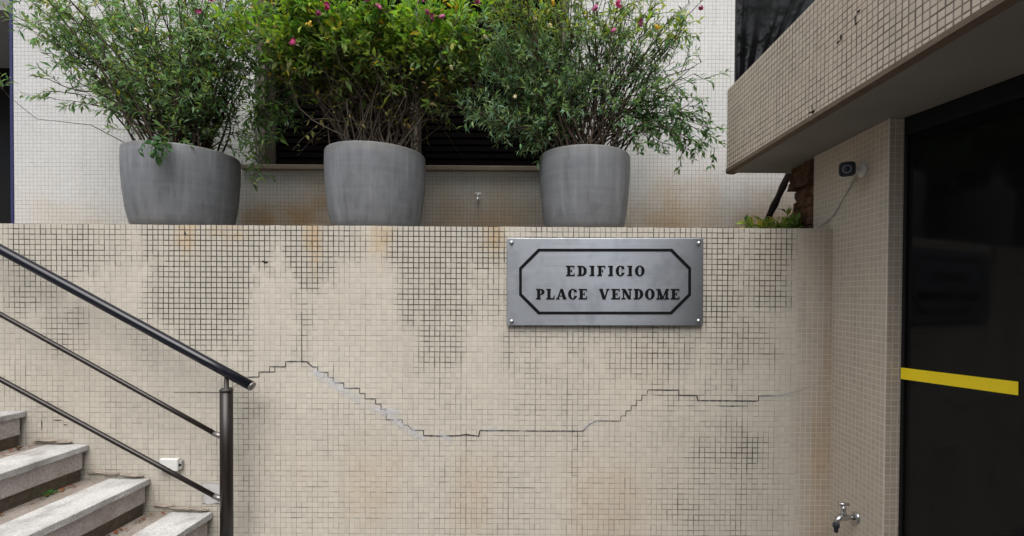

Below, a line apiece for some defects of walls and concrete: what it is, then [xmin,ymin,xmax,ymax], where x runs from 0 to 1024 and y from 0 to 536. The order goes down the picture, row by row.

crack [175,312,770,450]